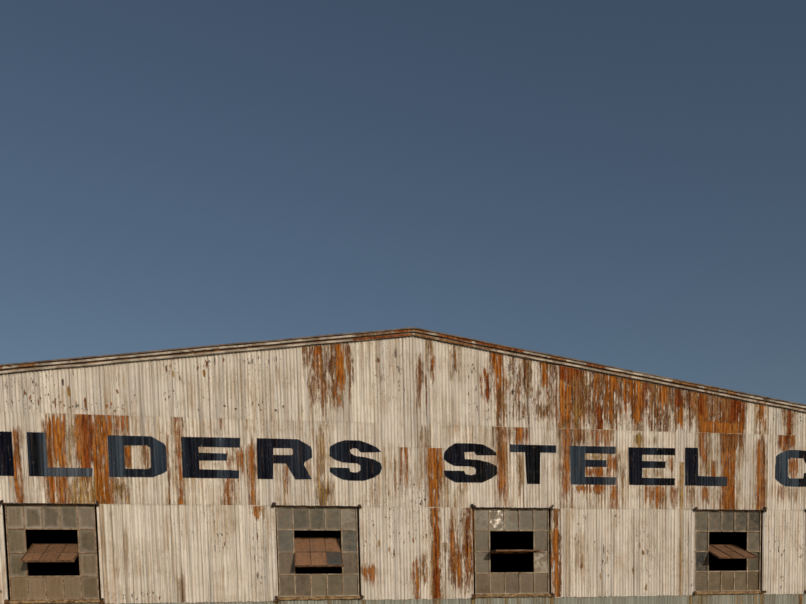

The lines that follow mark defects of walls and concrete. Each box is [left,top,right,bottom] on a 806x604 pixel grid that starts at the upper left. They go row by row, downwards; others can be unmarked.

rust [43,414,149,504]
rust [221,437,265,519]
rust [361,565,375,583]
rust [412,426,475,599]
rust [302,329,769,510]
rust [550,509,562,597]
rust [779,409,798,478]